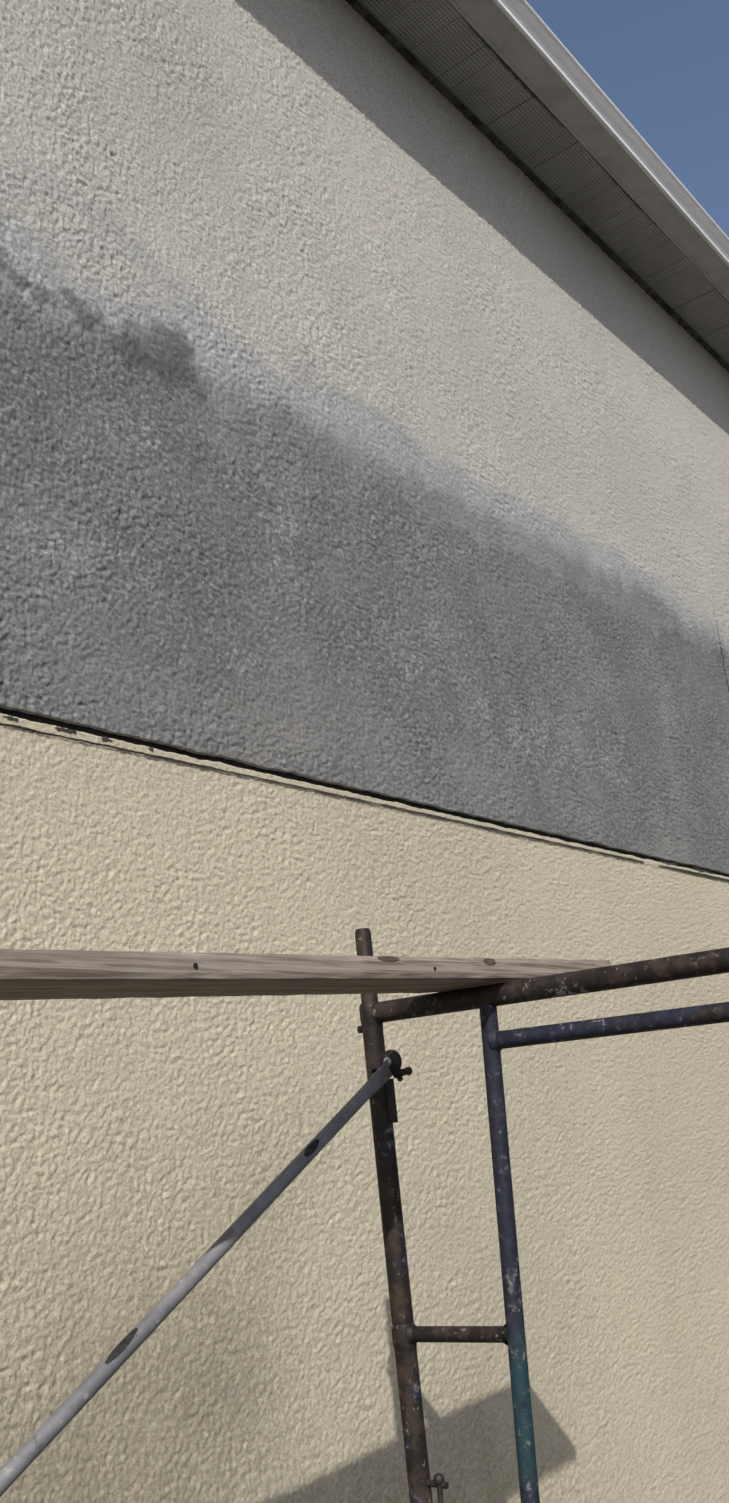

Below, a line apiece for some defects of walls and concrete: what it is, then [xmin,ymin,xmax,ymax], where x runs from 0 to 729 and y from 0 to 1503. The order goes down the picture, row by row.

damp [478,35,564,126]
damp [595,160,658,227]
damp [0,221,729,873]